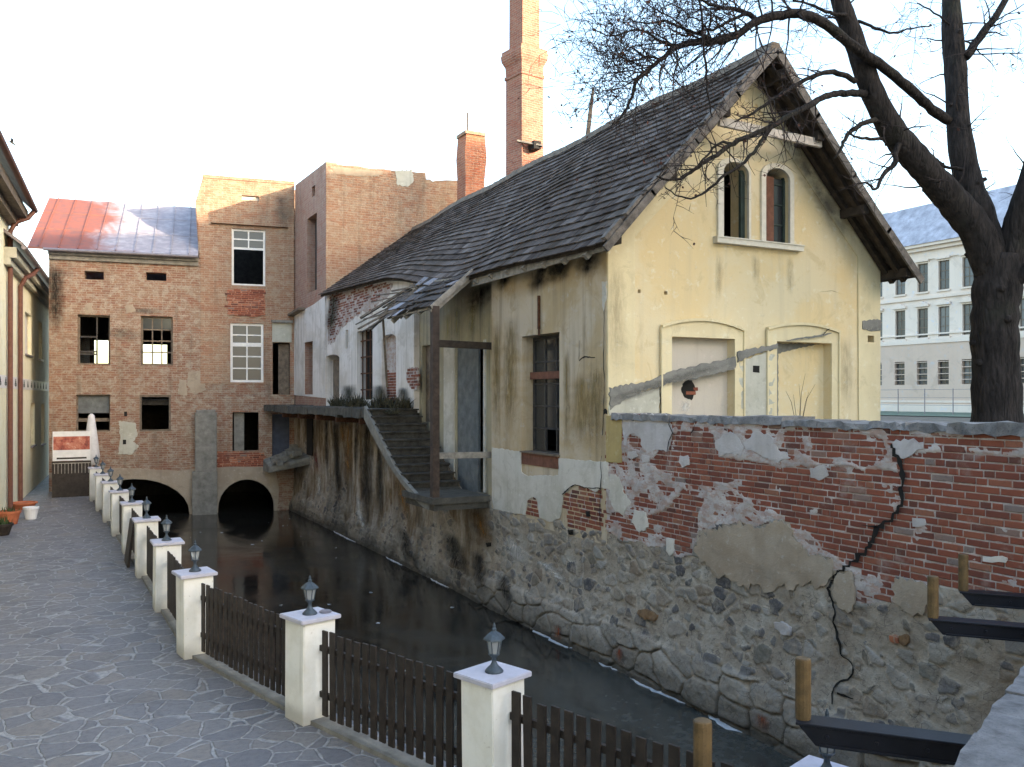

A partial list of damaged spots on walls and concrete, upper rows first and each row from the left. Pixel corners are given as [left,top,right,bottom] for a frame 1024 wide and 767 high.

flaking render [327,282,393,345]
damp [471,277,509,329]
damp [495,330,514,405]
spalling [681,380,698,400]
damp [318,422,340,492]
damp [354,423,382,525]
flaking render [562,388,690,532]
flaking render [715,431,790,463]
flaking render [892,438,924,459]
damp [446,536,485,583]
flaking render [694,519,856,613]
crack [826,444,905,704]